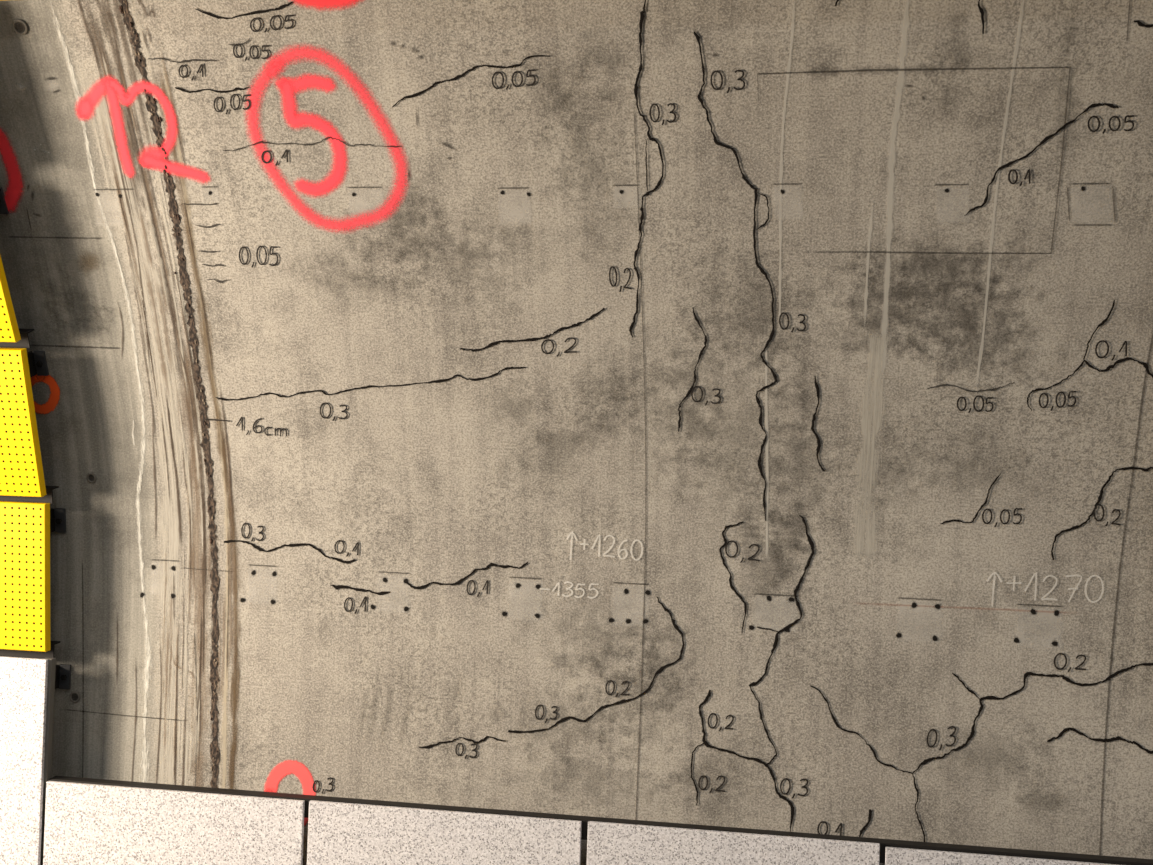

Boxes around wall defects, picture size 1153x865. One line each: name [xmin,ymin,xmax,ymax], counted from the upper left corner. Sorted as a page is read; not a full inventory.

crack [1133,20,1153,28]
crack [629,0,664,338]
crack [964,103,1119,216]
crack [118,0,605,788]
crack [678,307,707,432]
crack [691,32,814,832]
crack [811,376,825,472]
crack [927,300,1153,411]
crack [1051,467,1153,560]
crack [419,597,685,749]
crack [810,663,1153,842]